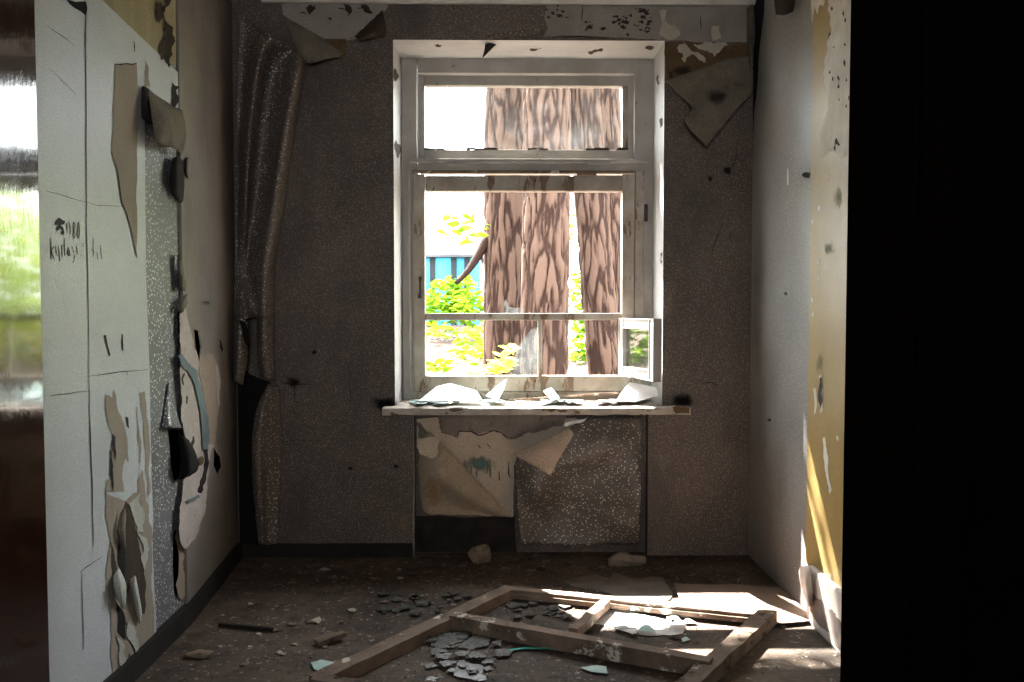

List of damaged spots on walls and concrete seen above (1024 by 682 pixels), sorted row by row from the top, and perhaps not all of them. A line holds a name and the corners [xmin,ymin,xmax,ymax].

flaking render [281,4,388,56]
peeling [111,60,150,256]
flaking render [168,308,223,549]
flaking render [417,414,579,517]
peeling [813,375,823,414]
peeling [823,437,832,494]
peeling [105,391,155,672]
peeling [799,566,841,654]